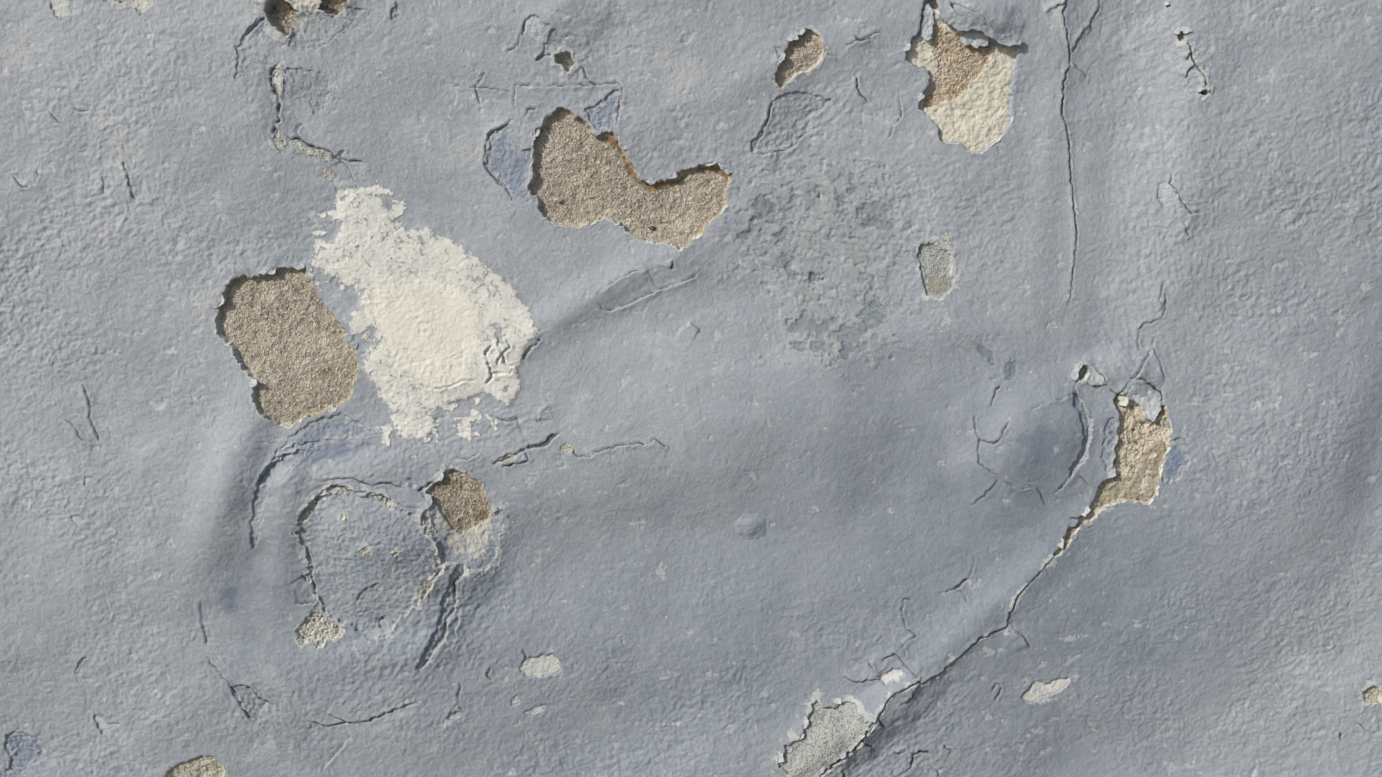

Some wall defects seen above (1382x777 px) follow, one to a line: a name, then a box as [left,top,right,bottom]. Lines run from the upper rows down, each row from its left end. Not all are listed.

peeling [234,0,373,116]
crack [264,60,363,183]
spalling [484,89,734,252]
peeling [750,23,832,153]
spalling [902,0,1022,154]
crack [1043,0,1099,315]
crack [1170,174,1201,236]
spalling [212,262,380,549]
peeling [290,462,515,671]
crack [812,282,1167,777]
spalling [1053,359,1191,558]
spalling [764,688,878,777]